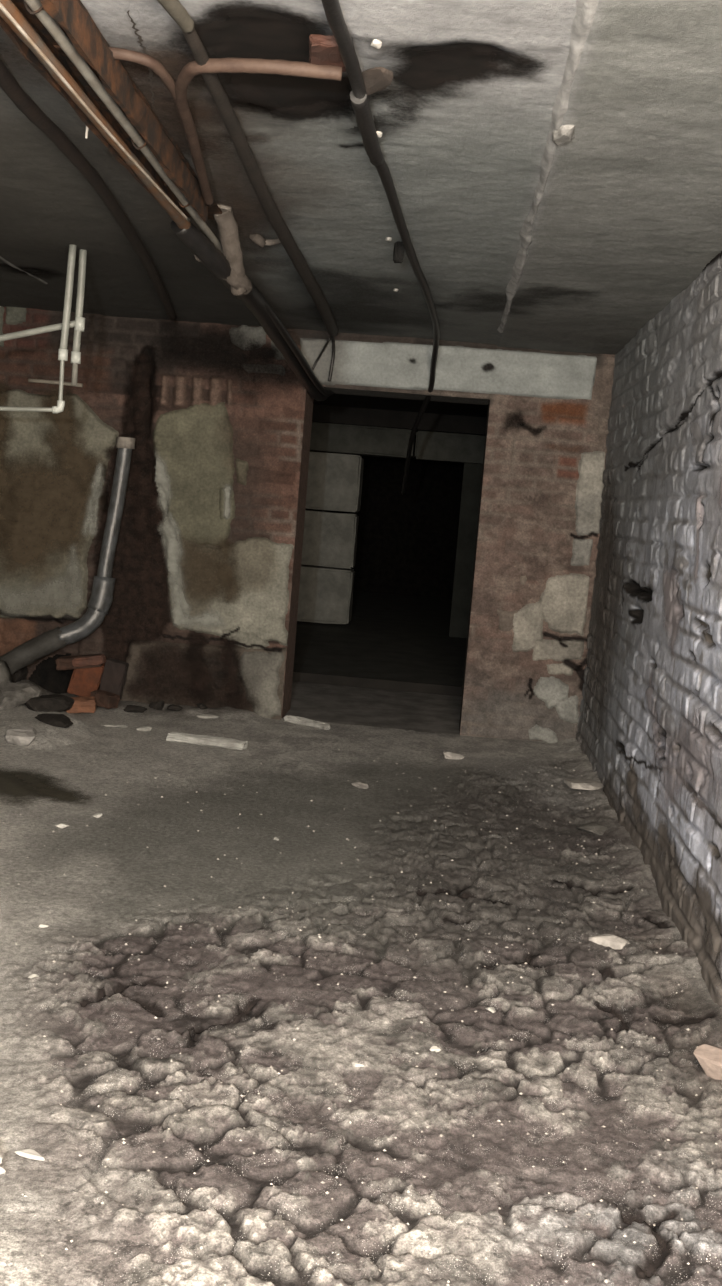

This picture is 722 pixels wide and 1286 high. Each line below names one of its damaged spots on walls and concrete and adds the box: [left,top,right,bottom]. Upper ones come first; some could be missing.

water stain [401,42,538,67]
water stain [270,98,340,119]
crack [624,371,722,471]
water stain [0,345,256,711]
peeling [512,451,605,743]
water stain [0,770,89,803]
crack [416,886,509,925]
crack [553,880,670,929]
crack [481,955,539,970]
crack [80,980,261,1048]
crack [594,966,714,1032]
crack [622,1212,677,1279]